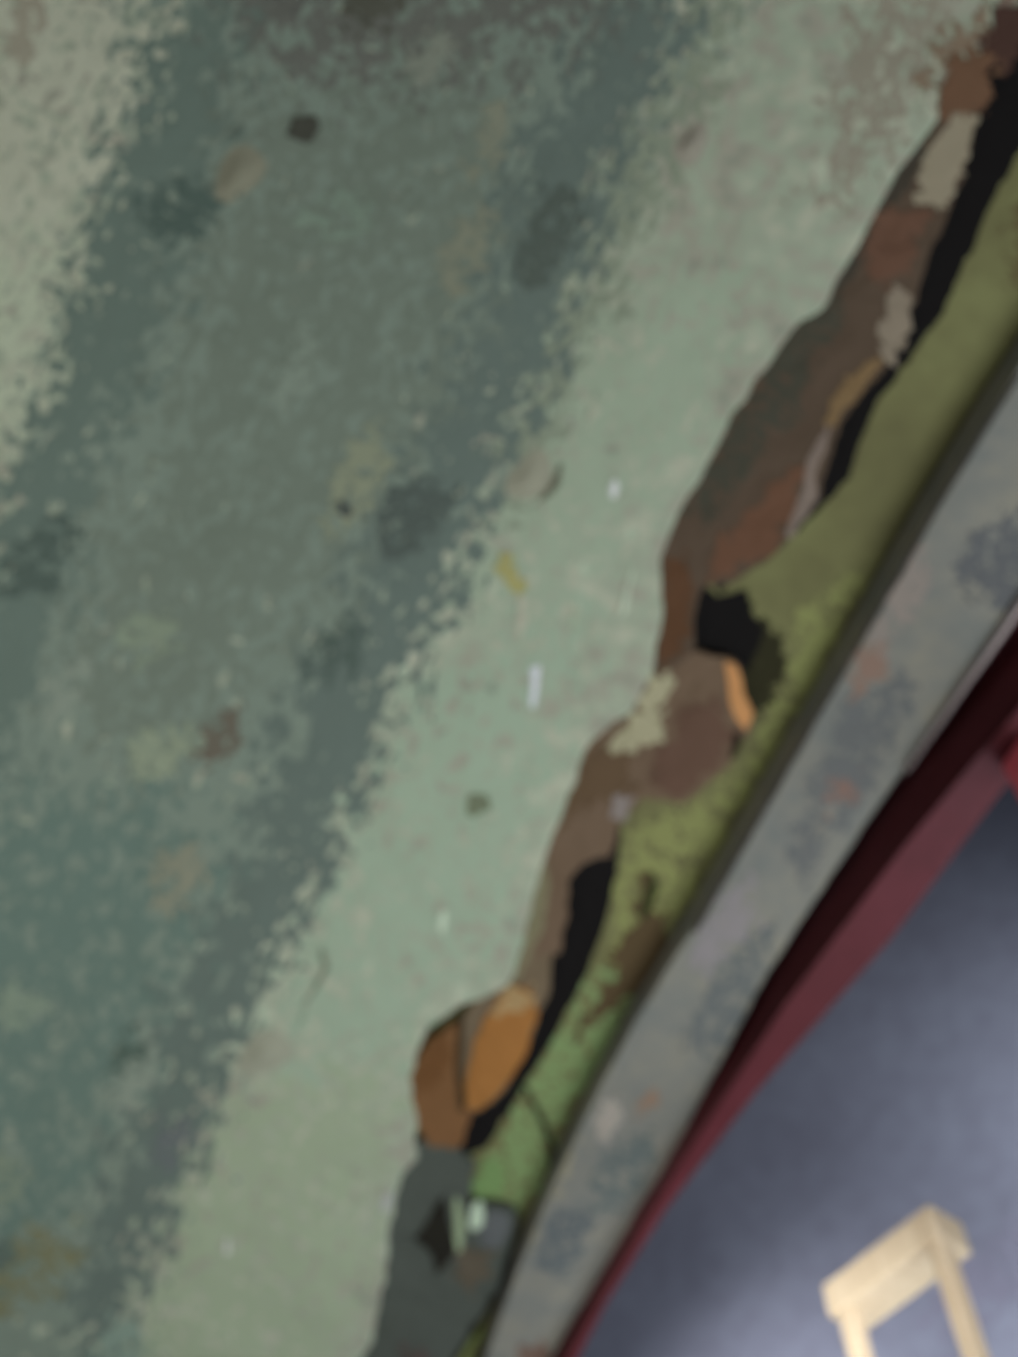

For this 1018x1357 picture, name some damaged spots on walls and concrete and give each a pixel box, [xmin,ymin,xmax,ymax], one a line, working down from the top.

rust [824,357,883,427]
rust [655,550,694,669]
leakage [0,0,759,1357]
spalling [363,106,980,1357]
rust [414,1035,451,1095]
rust [464,983,539,1110]